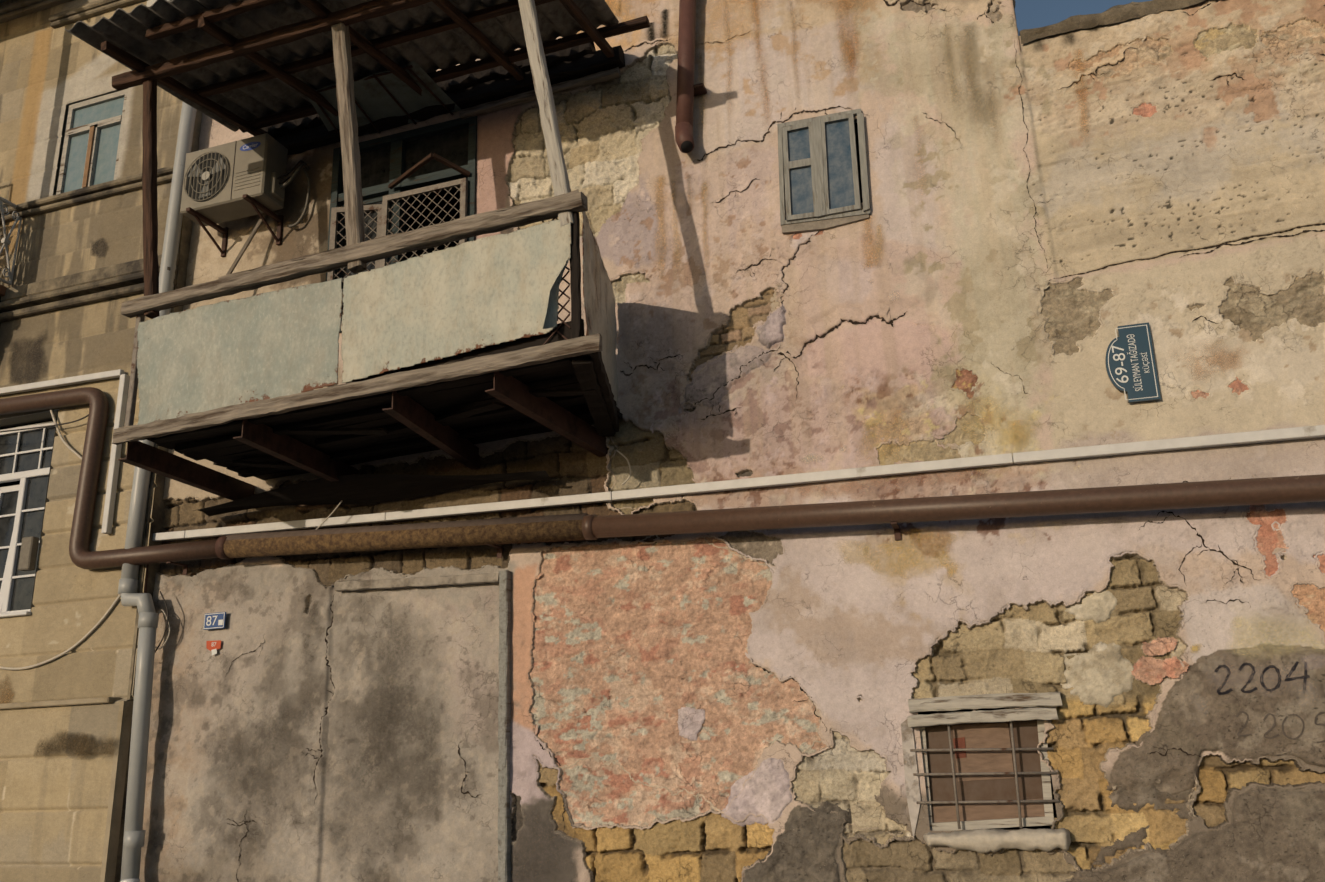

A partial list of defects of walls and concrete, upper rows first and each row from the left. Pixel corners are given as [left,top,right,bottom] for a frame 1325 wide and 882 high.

damp [648,9,668,41]
crack [883,0,947,11]
spalling [503,41,678,238]
crack [694,101,870,161]
crack [977,0,1325,281]
spalling [684,285,784,384]
crack [684,231,908,420]
spalling [1035,275,1116,358]
spalling [1185,269,1325,343]
spalling [162,418,699,545]
crack [1138,481,1257,607]
peeling [156,530,1325,882]